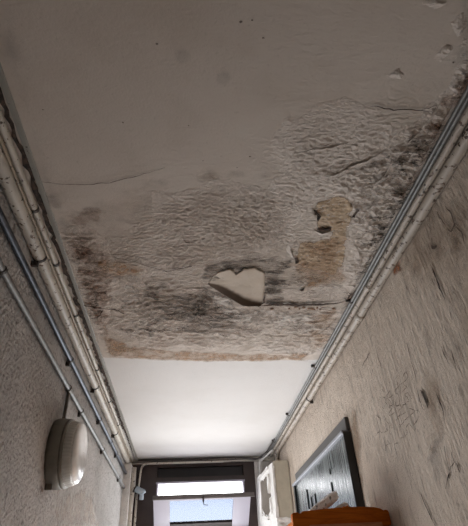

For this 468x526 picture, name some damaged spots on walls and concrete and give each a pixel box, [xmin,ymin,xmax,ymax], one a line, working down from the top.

crack [367,104,437,112]
spalling [286,39,468,296]
mould [362,123,443,246]
leakage [204,259,266,279]
leakage [265,262,334,303]
leakage [143,296,233,337]
peeling [106,267,345,358]
leakage [111,343,241,360]